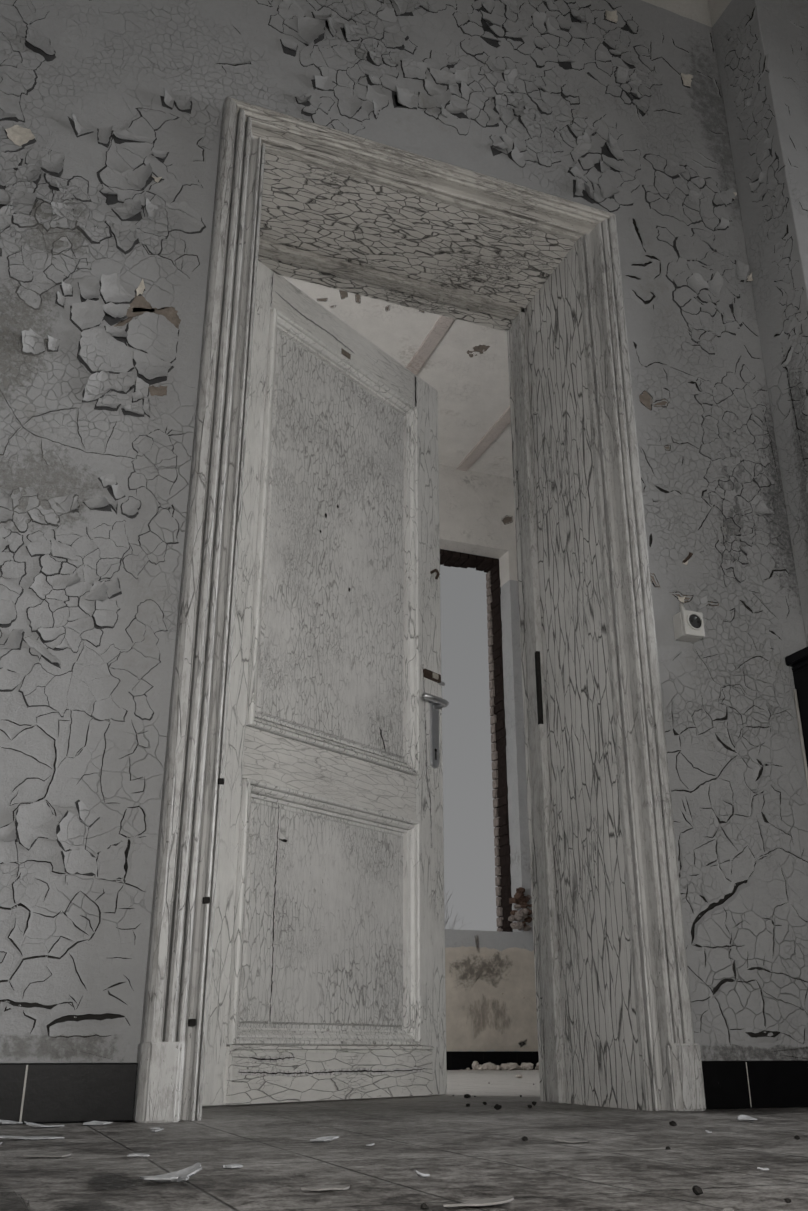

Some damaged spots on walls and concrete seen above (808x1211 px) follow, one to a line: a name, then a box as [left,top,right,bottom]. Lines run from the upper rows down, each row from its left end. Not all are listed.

peeling [0,472,168,721]
peeling [0,0,206,417]
crack [275,290,355,354]
flaking render [467,345,490,358]
peeling [256,0,753,355]
flaking render [637,389,671,413]
crack [639,436,758,548]
crack [625,217,808,473]
peeling [0,800,126,881]
crack [0,709,150,1041]
crack [665,567,808,1046]
crack [237,1055,428,1077]